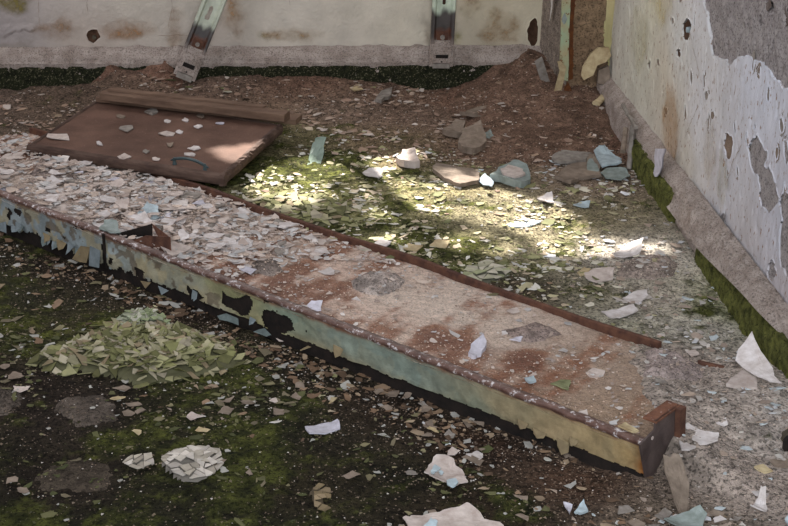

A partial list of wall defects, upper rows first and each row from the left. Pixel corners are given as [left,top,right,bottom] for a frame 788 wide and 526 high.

spalling [672,18,695,40]
peeling [705,0,788,88]
peeling [594,145,622,168]
peeling [362,168,383,178]
peeling [0,151,257,275]
spalling [667,112,788,332]
peeling [403,239,450,251]
peeling [577,267,615,283]
peeling [307,300,323,311]
peeling [601,289,648,319]
peeling [305,419,340,434]
peeling [424,454,468,488]